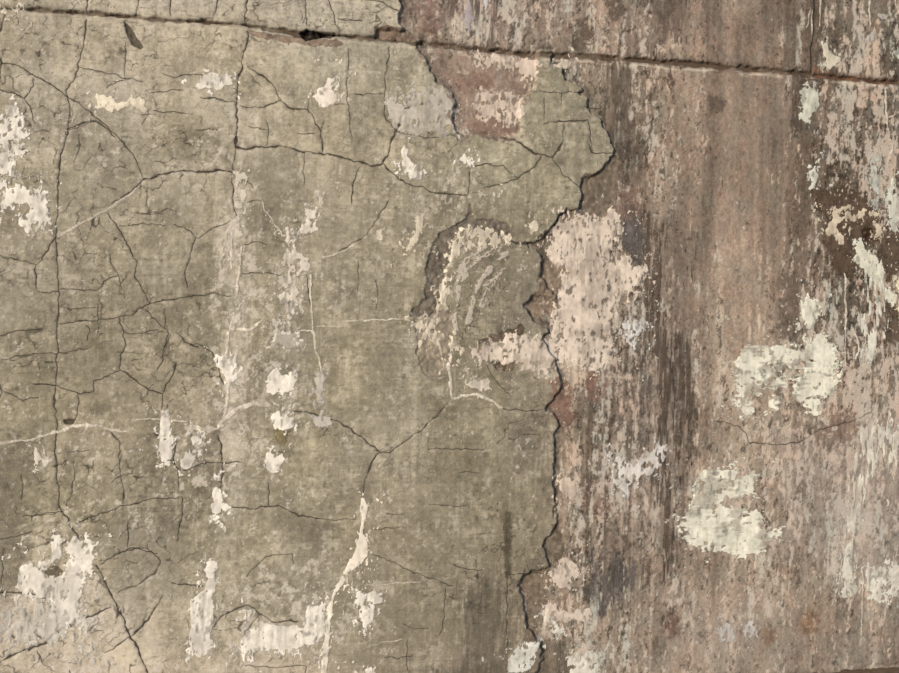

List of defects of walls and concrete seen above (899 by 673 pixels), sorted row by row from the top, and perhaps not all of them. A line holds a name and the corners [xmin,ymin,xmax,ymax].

peeling [0,94,62,238]
peeling [380,45,582,184]
crack [0,0,609,673]
peeling [391,156,661,399]
peeling [721,144,899,426]
peeling [0,519,114,666]
peeling [169,485,387,673]
spalling [494,524,607,673]
peeling [601,437,676,499]
peeling [664,457,796,563]
crack [717,412,871,445]
peeling [826,403,899,617]